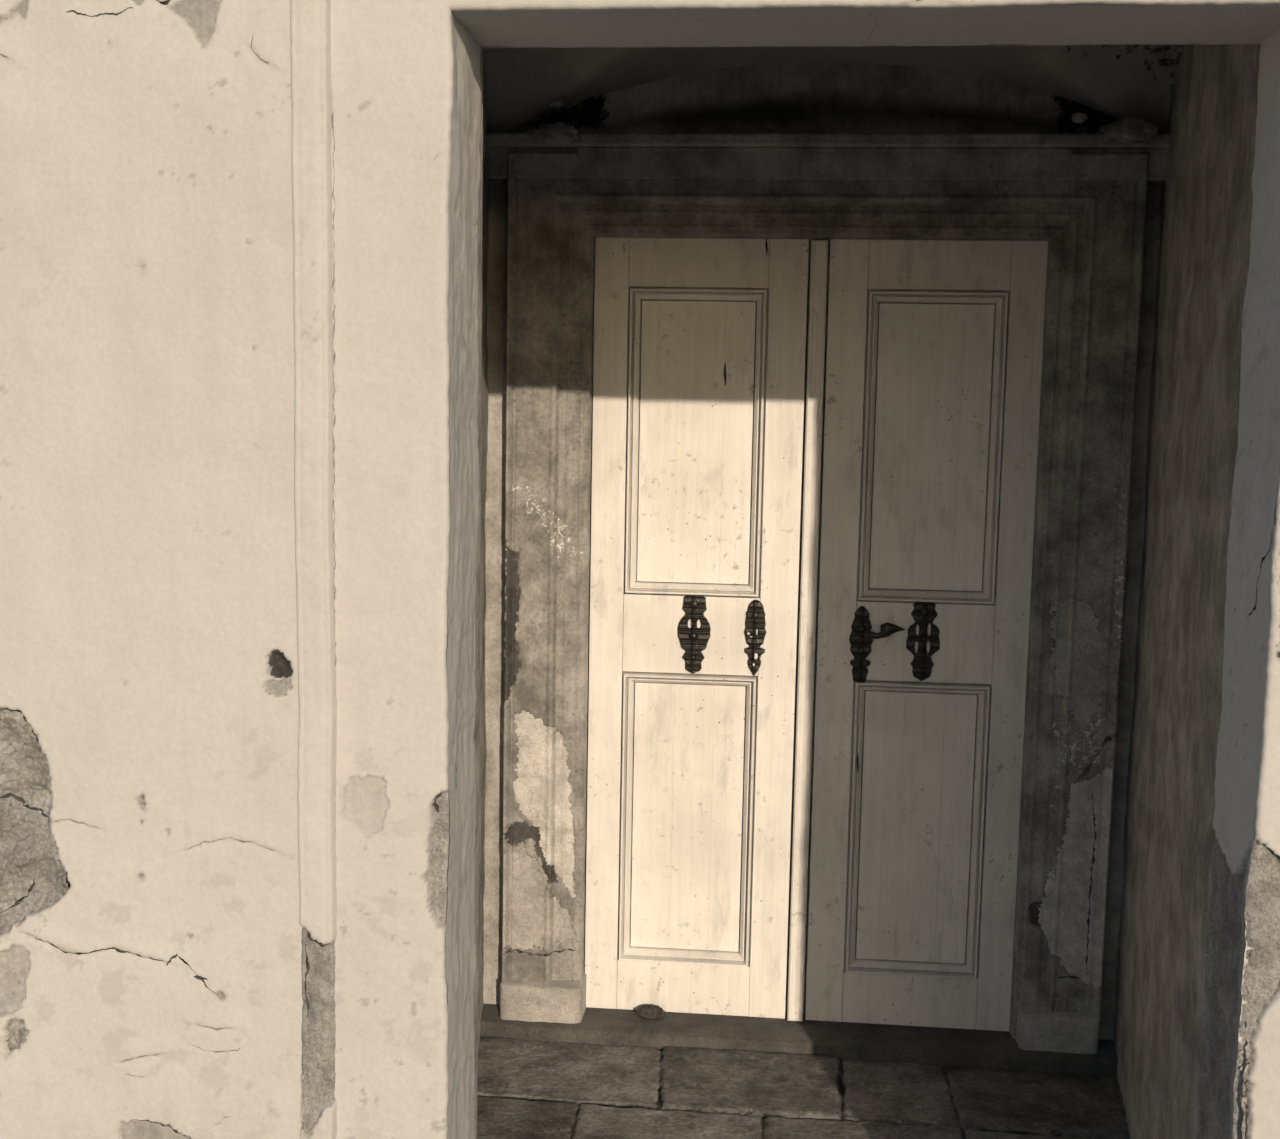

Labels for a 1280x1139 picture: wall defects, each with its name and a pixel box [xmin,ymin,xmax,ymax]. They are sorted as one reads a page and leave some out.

peeling [171,0,221,47]
leakage [1067,45,1182,96]
spalling [269,649,293,678]
peeling [504,541,522,702]
flaking render [0,707,70,1051]
peeling [502,710,577,951]
peeling [1029,732,1117,988]
crack [26,933,216,994]
peeling [122,1119,191,1139]
crack [120,1025,245,1077]
spalling [301,927,336,1134]
spalling [1196,838,1280,1139]